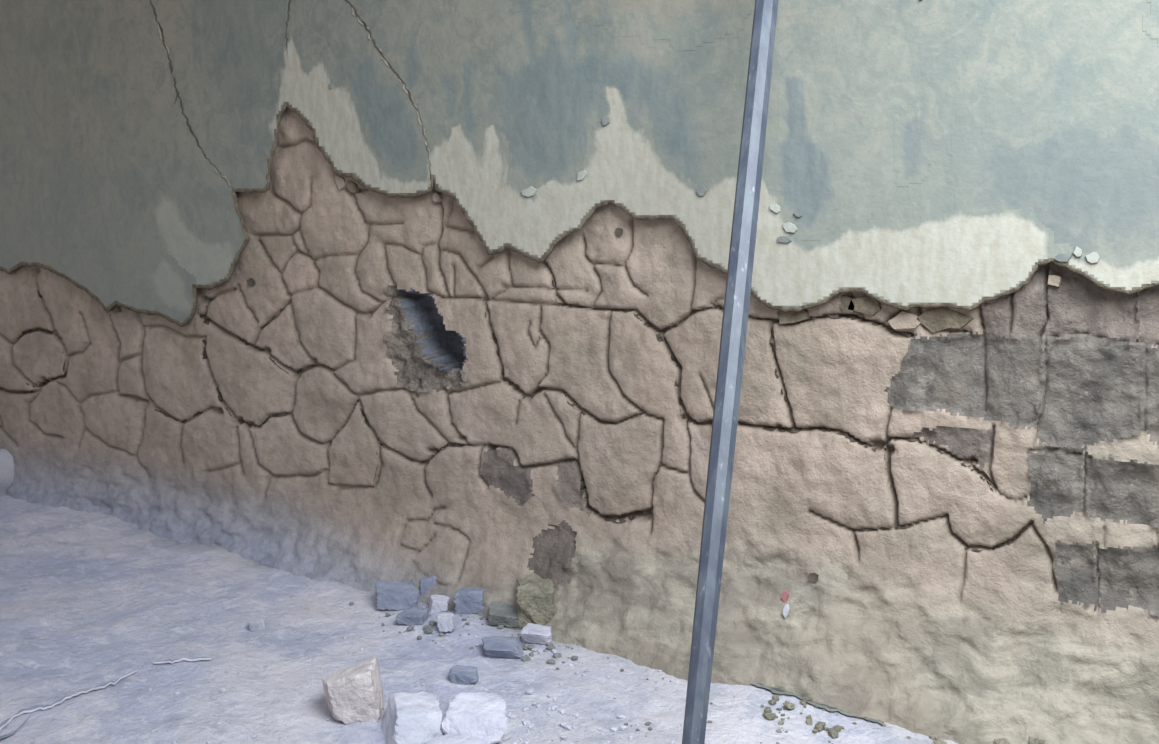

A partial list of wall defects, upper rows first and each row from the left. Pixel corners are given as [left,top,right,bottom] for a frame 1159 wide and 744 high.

leakage [894,108,931,187]
leakage [947,78,1159,261]
crack [0,328,66,394]
crack [155,388,287,428]
crack [236,308,316,374]
flaking render [0,31,738,681]
crack [357,400,473,480]
crack [482,300,640,425]
crack [552,279,993,491]
flaking render [711,171,1159,744]
crack [580,475,651,523]
crack [852,517,1032,551]